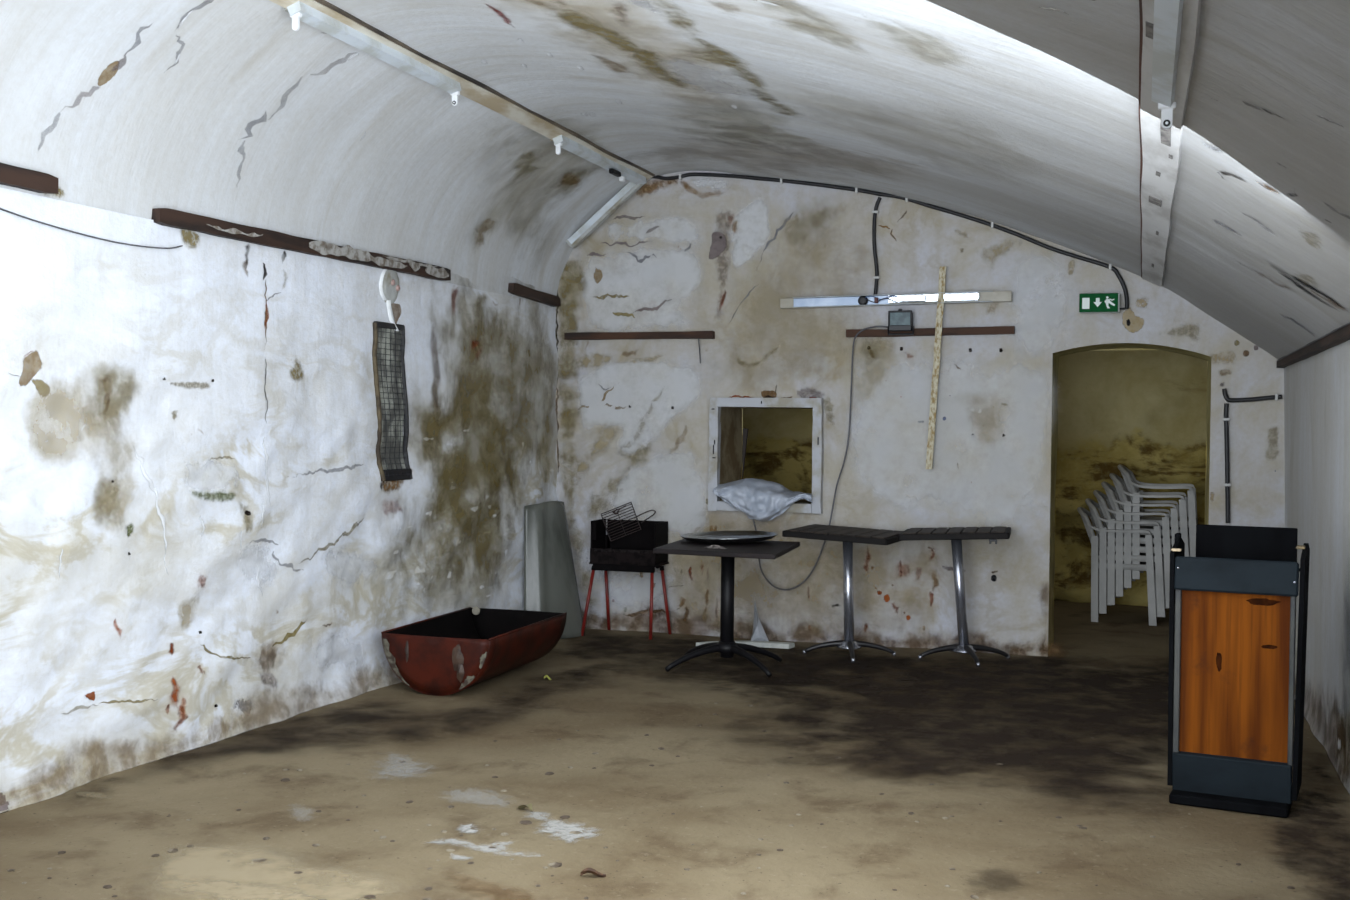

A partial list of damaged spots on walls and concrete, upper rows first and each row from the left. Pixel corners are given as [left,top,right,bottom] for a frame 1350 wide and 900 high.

damp [560,13,684,86]
damp [700,41,790,115]
spalling [709,232,726,259]
spalling [9,351,50,397]
damp [400,262,655,586]
damp [1294,684,1350,782]
spalling [0,791,9,814]
damp [1277,792,1350,900]